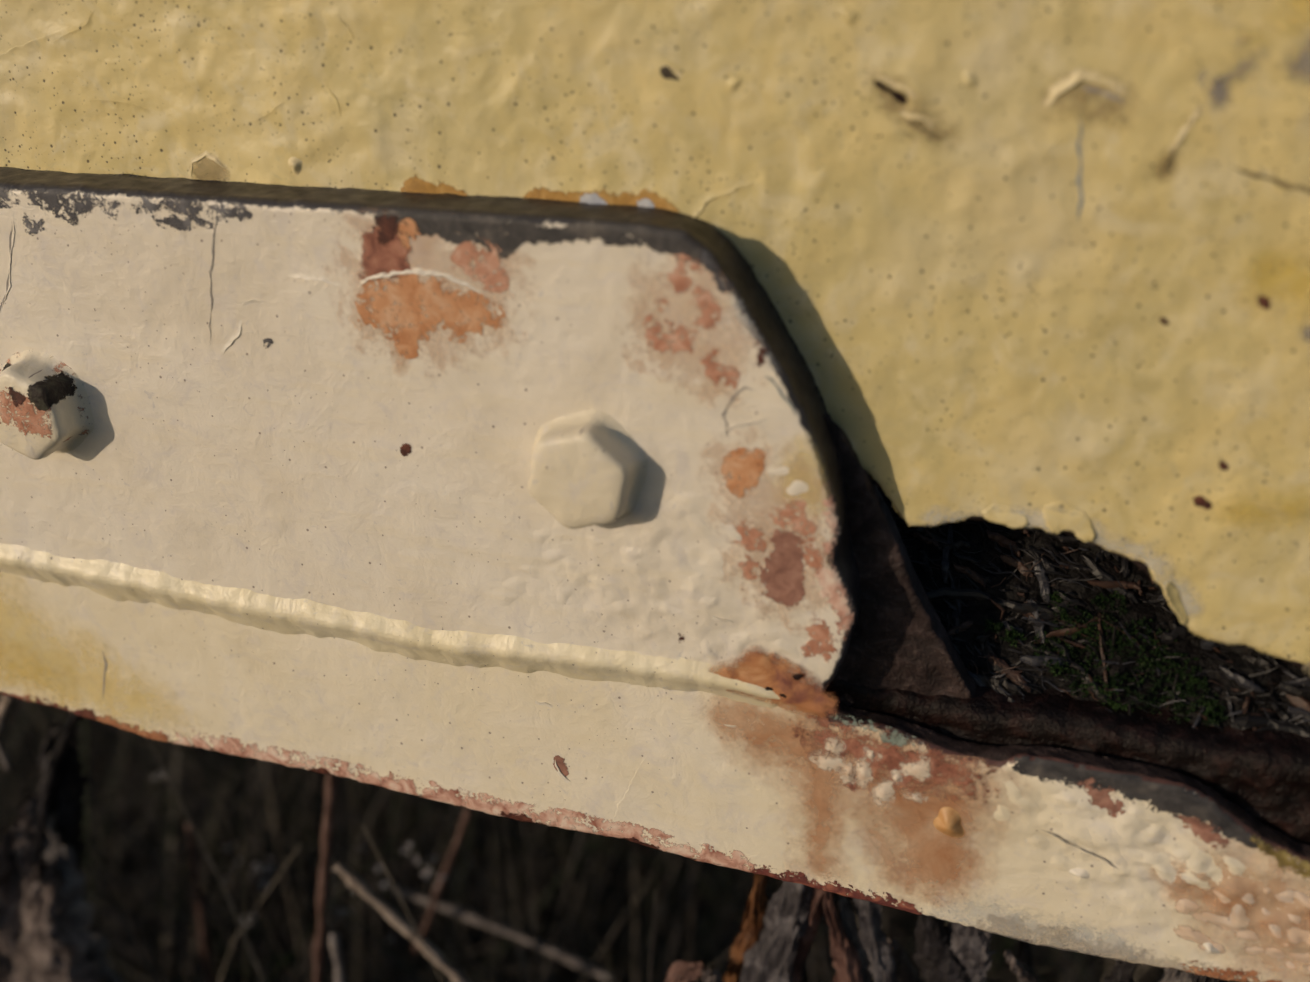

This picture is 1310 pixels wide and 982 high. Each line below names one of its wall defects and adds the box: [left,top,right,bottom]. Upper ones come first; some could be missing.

peeling [0,185,252,236]
spalling [188,151,229,181]
crack [1230,162,1310,195]
rust [351,209,510,359]
rust [0,362,88,442]
peeling [982,501,1095,542]
peeling [1165,581,1188,625]
rust [0,691,922,915]
rust [716,679,1310,885]
peeling [1011,756,1262,850]
rust [1174,862,1310,982]